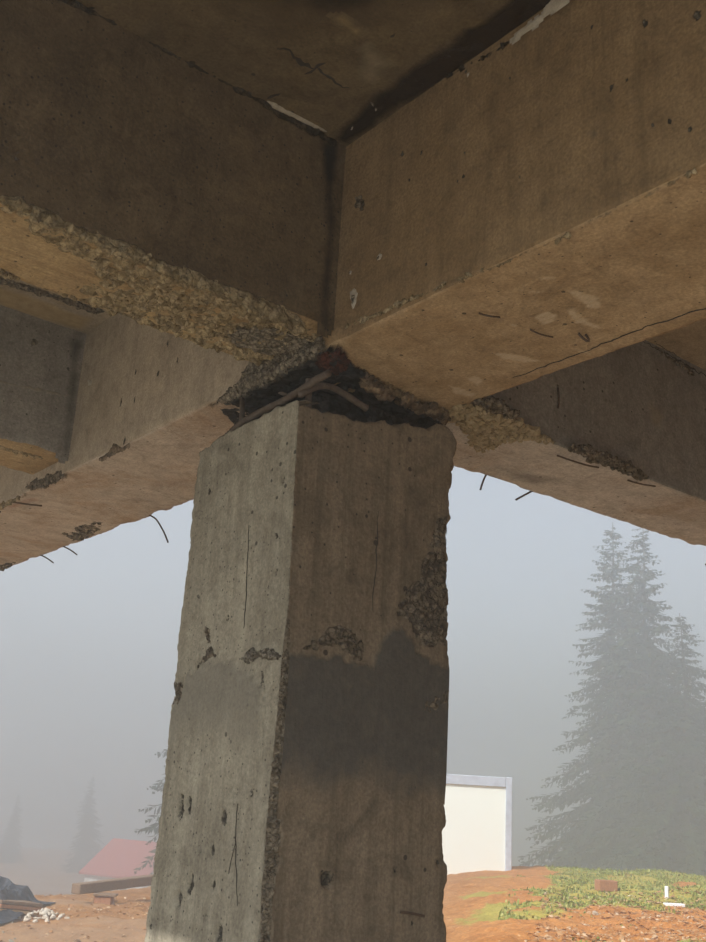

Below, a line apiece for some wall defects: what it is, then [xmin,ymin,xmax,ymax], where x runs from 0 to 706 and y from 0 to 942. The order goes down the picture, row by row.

crack [277,48,349,88]
water stain [169,0,551,338]
spalling [0,195,454,436]
spalling [473,396,521,419]
spalling [0,470,67,513]
spalling [241,582,291,720]
spalling [303,625,364,661]
spalling [397,516,448,647]
spalling [260,735,282,942]